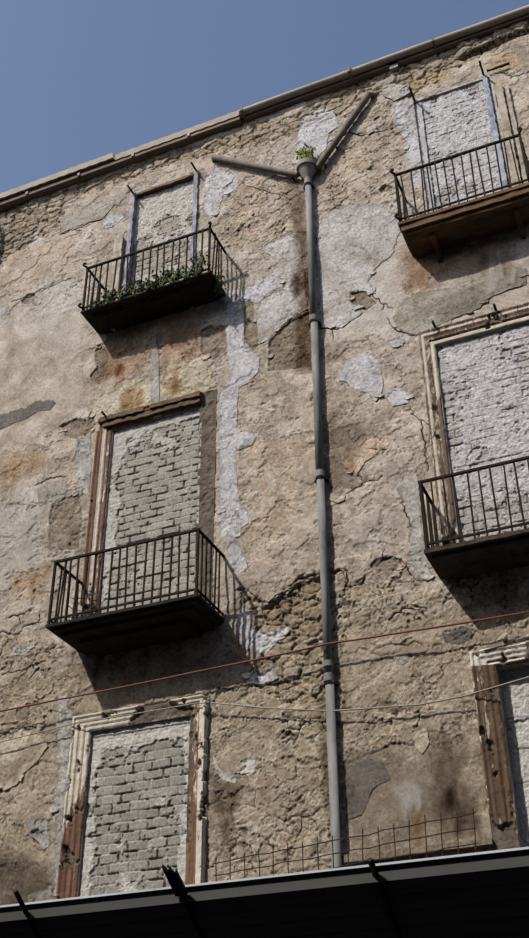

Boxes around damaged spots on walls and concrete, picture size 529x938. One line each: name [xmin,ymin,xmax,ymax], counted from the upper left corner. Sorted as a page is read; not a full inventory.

flaking render [291,109,339,164]
flaking render [203,167,240,218]
flaking render [338,351,414,406]
crack [410,408,428,472]
crack [244,550,422,613]
crack [0,609,41,640]
flaking render [236,578,323,655]
crack [389,604,426,620]
flaking render [242,667,278,686]